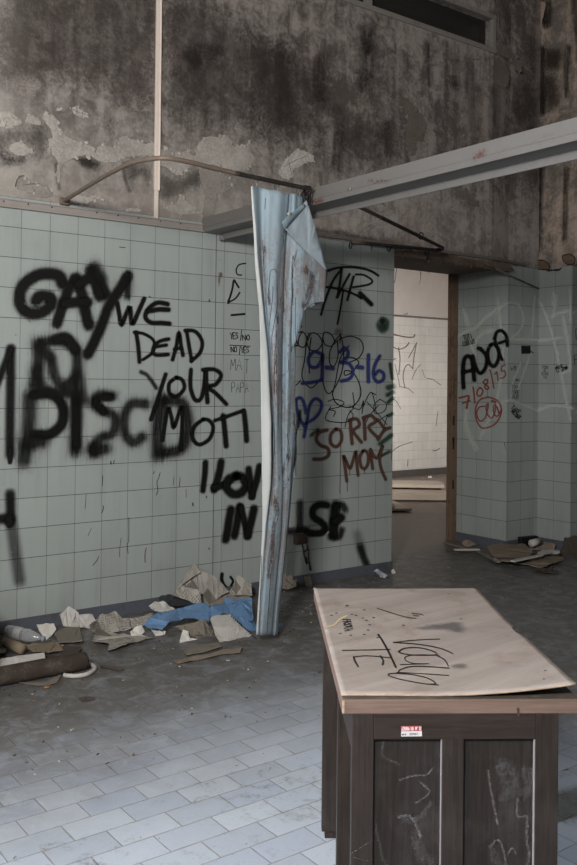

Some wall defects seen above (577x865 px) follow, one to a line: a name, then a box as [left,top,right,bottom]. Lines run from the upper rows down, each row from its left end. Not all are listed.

water stain [542,0,551,28]
water stain [540,46,570,115]
peeling [0,105,254,218]
peeling [279,148,323,186]